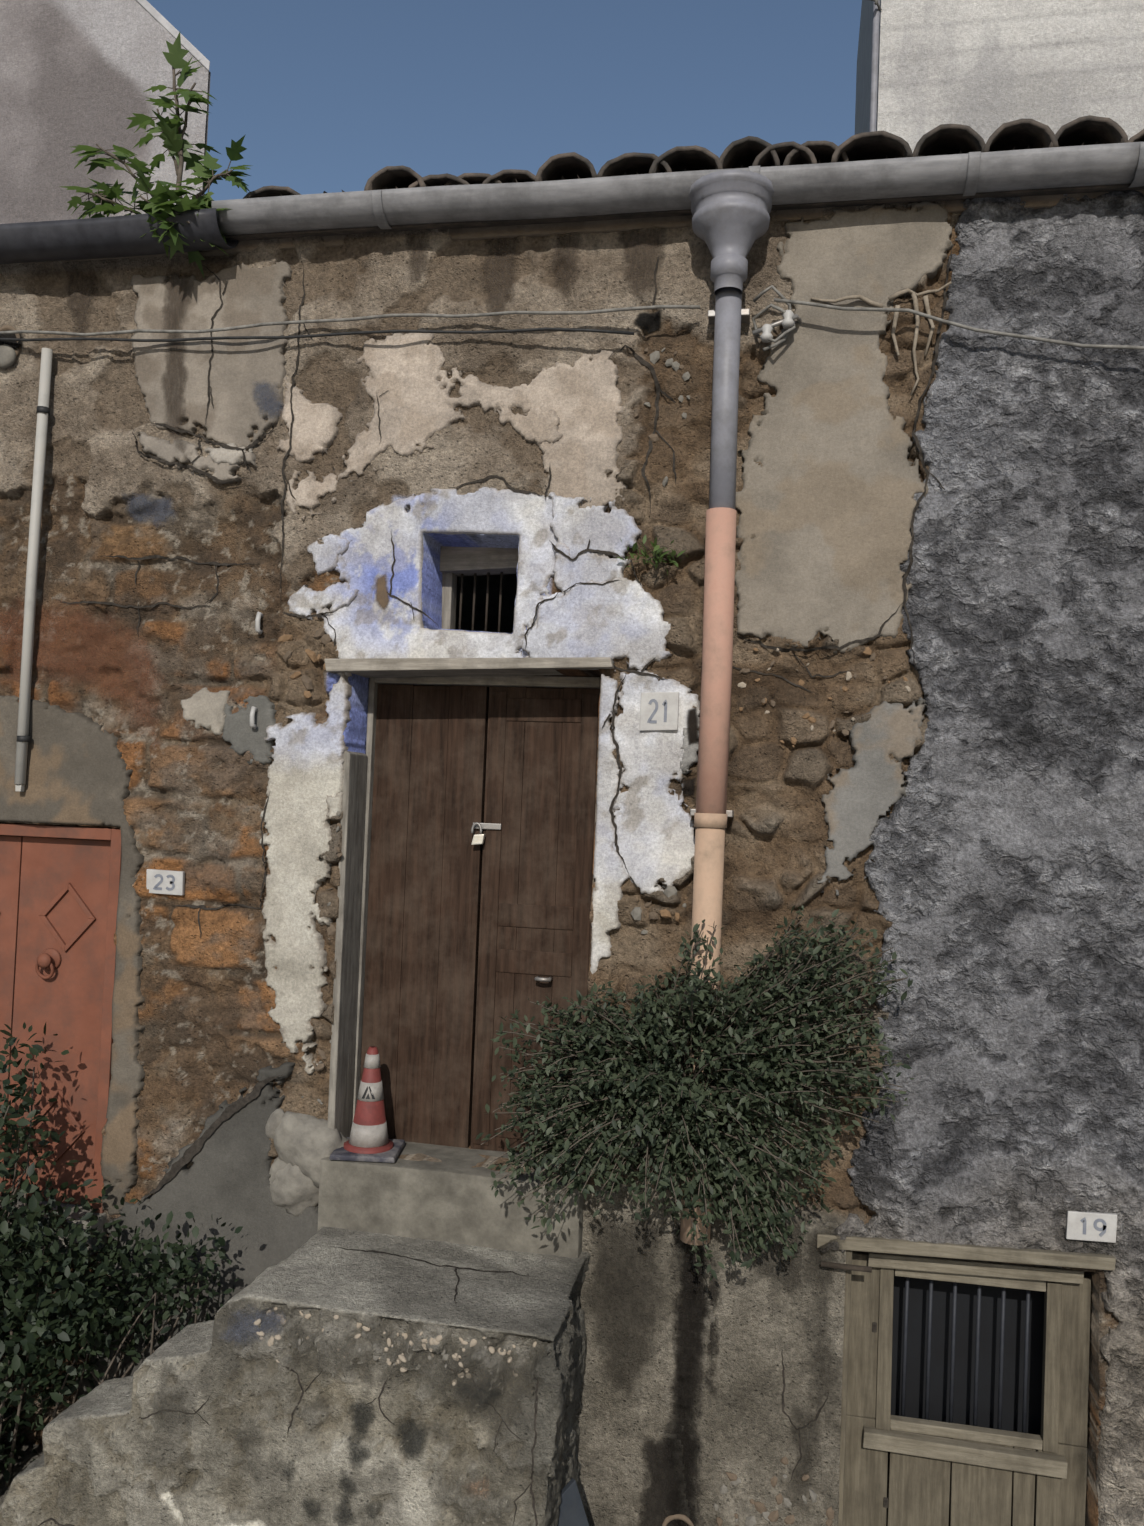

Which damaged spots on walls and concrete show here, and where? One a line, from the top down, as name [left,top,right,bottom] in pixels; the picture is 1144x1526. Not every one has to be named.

damp [483,237,517,320]
damp [621,228,662,294]
peeling [735,200,963,748]
crack [388,534,438,626]
crack [524,539,642,649]
peeling [131,260,700,1074]
crack [602,658,668,887]
crack [281,1365,322,1438]
crack [366,1378,396,1426]
damp [598,1225,719,1526]
spalling [161,1491,182,1520]